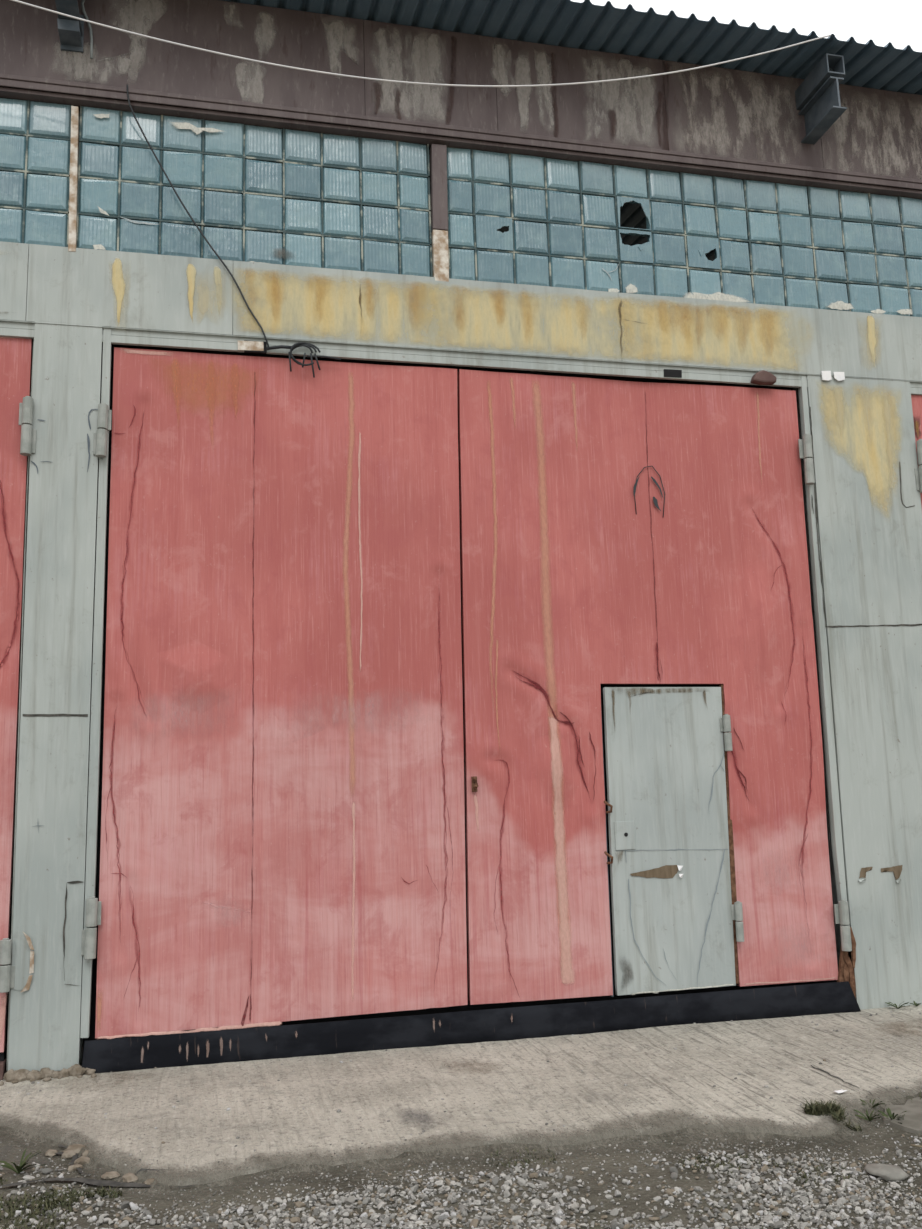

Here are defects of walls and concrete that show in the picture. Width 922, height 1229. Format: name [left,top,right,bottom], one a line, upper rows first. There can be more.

peeling [54,0,165,82]
peeling [235,13,275,104]
peeling [324,20,357,74]
peeling [373,29,445,120]
peeling [492,45,554,128]
peeling [584,59,654,143]
peeling [677,70,796,164]
peeling [834,98,922,177]
water stain [550,718,573,983]